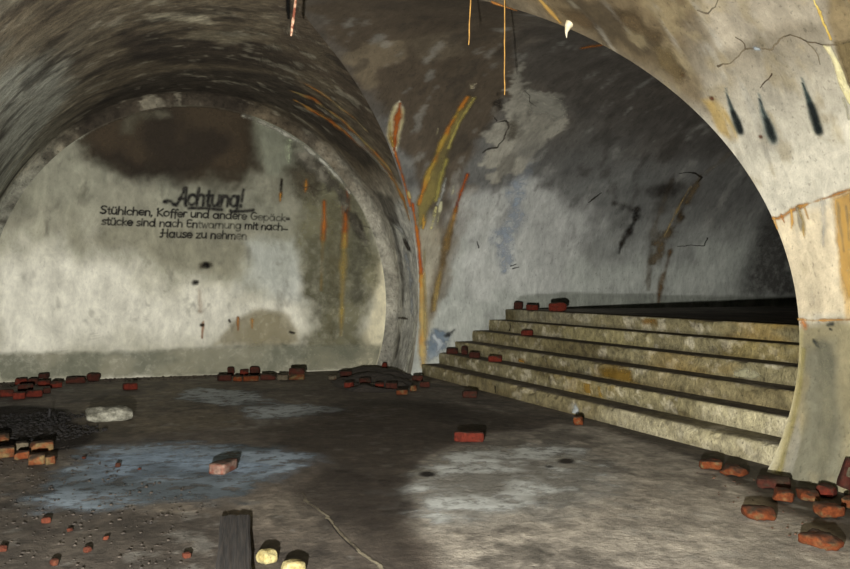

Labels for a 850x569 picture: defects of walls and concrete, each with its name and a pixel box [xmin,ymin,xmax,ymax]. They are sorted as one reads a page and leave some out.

crack [717,0,832,68]
damp [725,88,743,134]
damp [759,99,776,142]
damp [802,83,822,135]
damp [0,106,380,379]
corrosion [293,84,475,364]
damp [612,202,640,253]
damp [646,178,700,283]
corrosion [772,190,850,297]